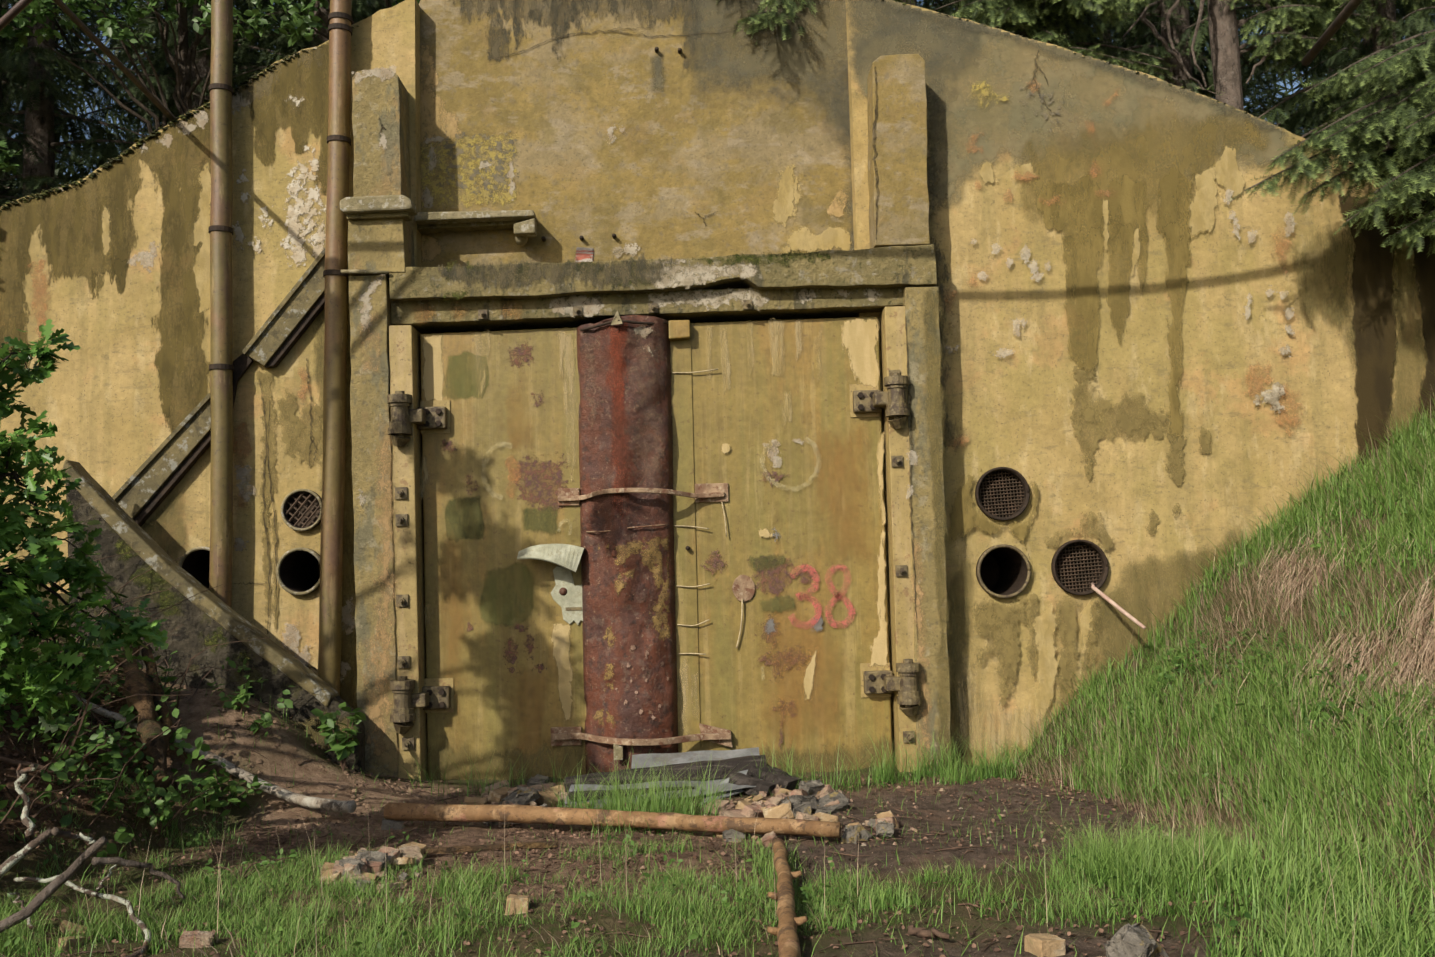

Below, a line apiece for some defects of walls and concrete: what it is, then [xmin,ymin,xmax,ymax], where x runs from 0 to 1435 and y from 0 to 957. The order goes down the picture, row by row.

leakage [0,105,211,433]
peeling [193,163,211,312]
peeling [232,145,326,269]
corrosion [506,454,568,511]
peeling [551,623,573,721]
corrosion [607,323,630,512]
spalling [546,164,853,427]
peeling [841,318,880,387]
leakage [925,292,1039,766]
leakage [1024,118,1266,486]
leakage [1054,534,1238,708]
leakage [1293,194,1435,467]